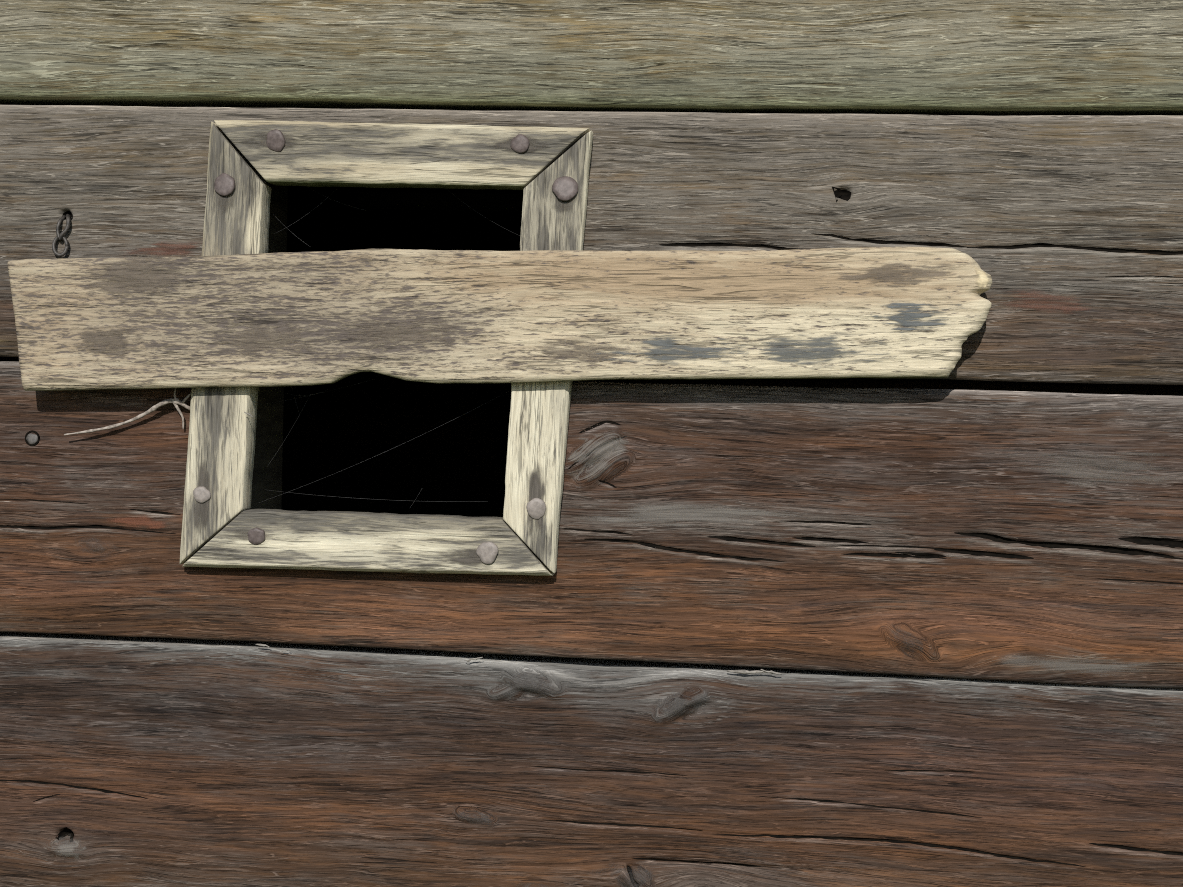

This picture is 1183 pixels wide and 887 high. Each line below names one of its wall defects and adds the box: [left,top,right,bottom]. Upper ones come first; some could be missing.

crack [659,233,1183,277]
crack [564,521,1183,584]
crack [885,767,973,775]
crack [761,796,983,818]
crack [548,820,1183,887]